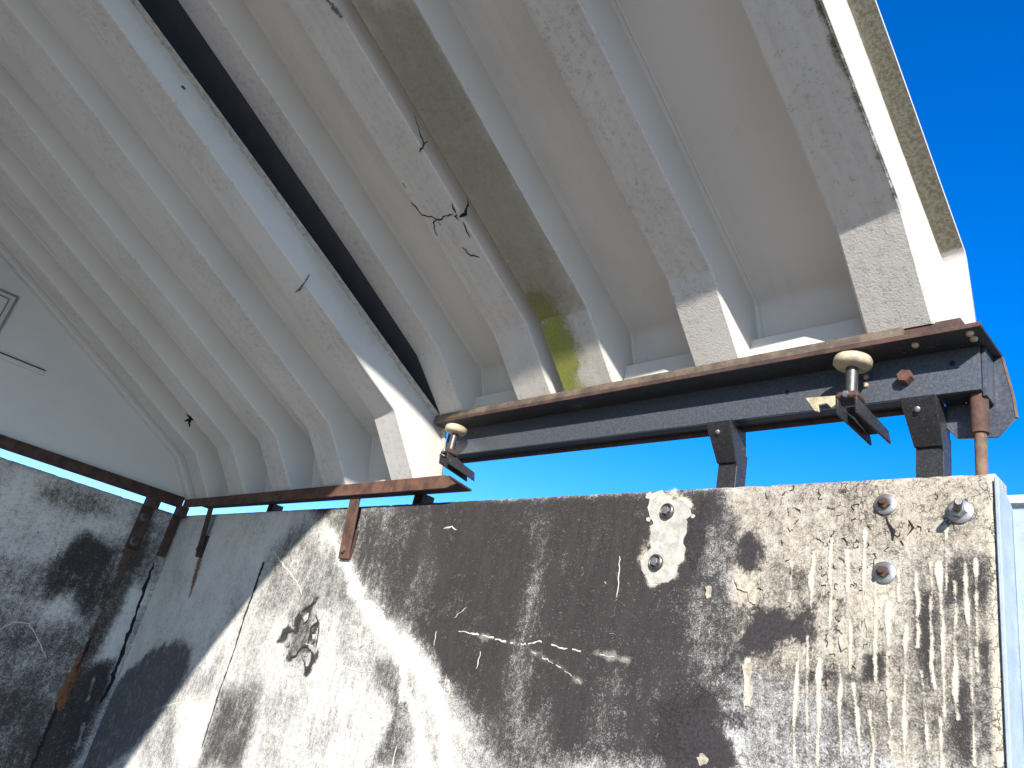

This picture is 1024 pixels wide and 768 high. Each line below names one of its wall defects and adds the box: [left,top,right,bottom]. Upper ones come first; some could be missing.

crack [403,184,478,257]
damp [526,292,582,391]
spalling [637,488,695,588]
crack [886,516,914,545]
rust [54,546,135,722]
crack [99,563,154,704]
peeling [276,595,320,677]
crack [458,631,629,685]
damp [649,526,979,768]